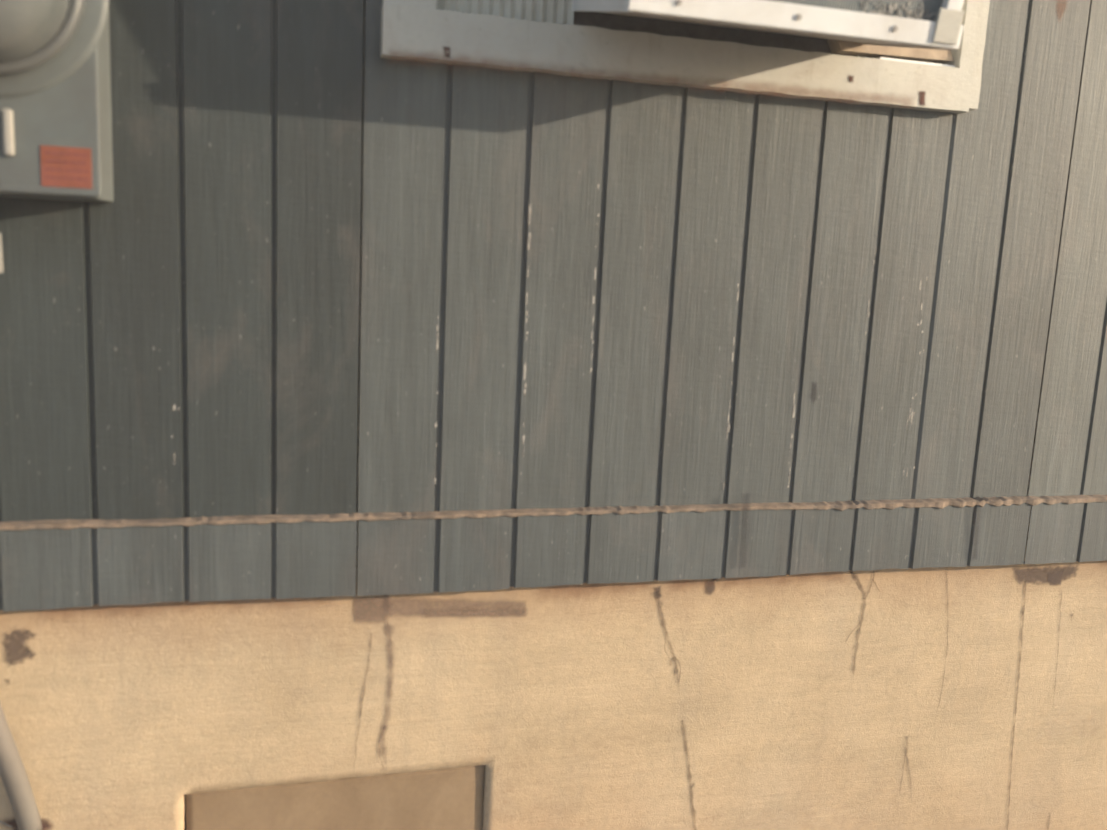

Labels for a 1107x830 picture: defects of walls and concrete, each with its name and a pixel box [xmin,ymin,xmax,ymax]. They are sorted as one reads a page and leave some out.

spalling [1015,566,1077,585]
leakage [355,597,525,621]
spalling [4,630,34,664]
crack [384,600,393,695]